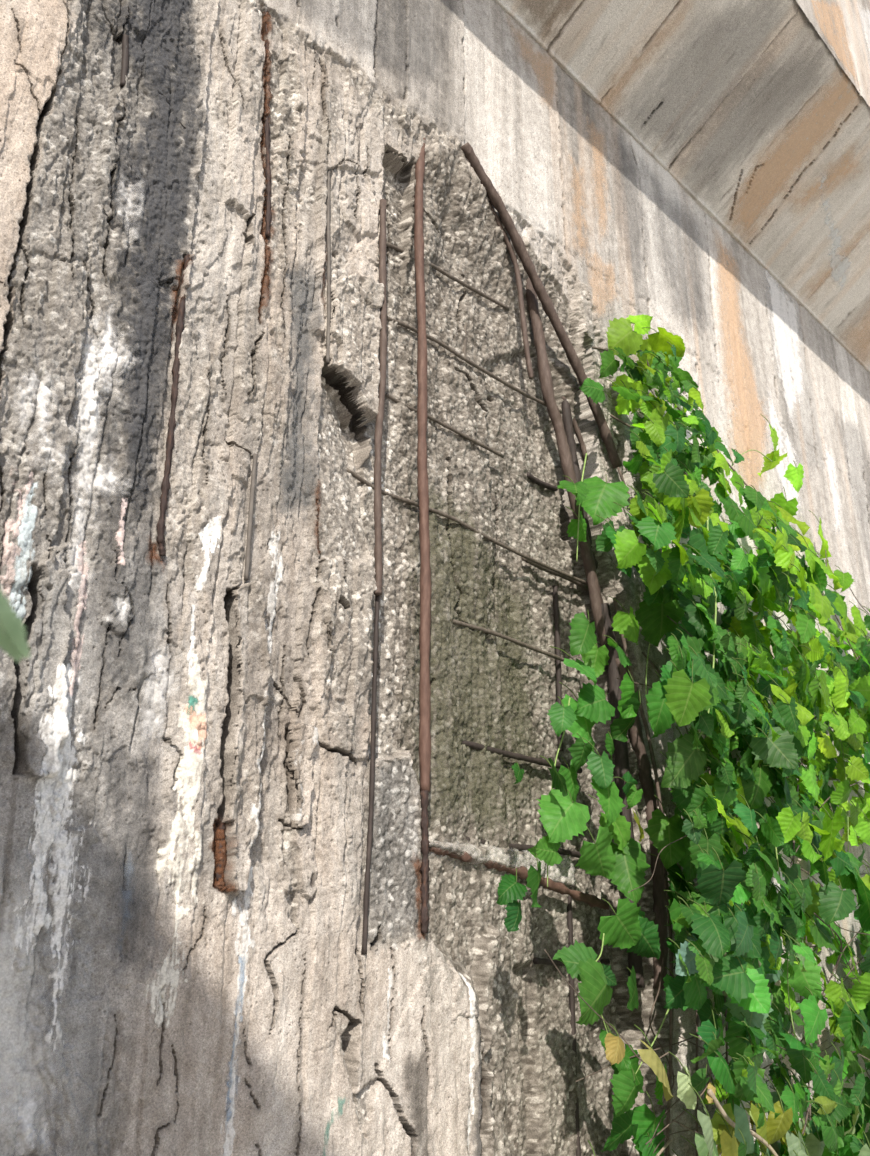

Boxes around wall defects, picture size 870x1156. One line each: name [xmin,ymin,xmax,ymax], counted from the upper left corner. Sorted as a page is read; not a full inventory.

rust [260,12,272,178]
crack [0,0,126,579]
spalling [0,0,222,620]
damp [68,0,203,585]
rust [259,195,273,305]
spalling [0,632,17,786]
efflorescence [146,651,172,730]
crack [273,498,347,773]
spalling [236,0,679,1156]
rust [212,823,235,892]
crack [243,928,307,1156]
crack [331,924,418,1156]